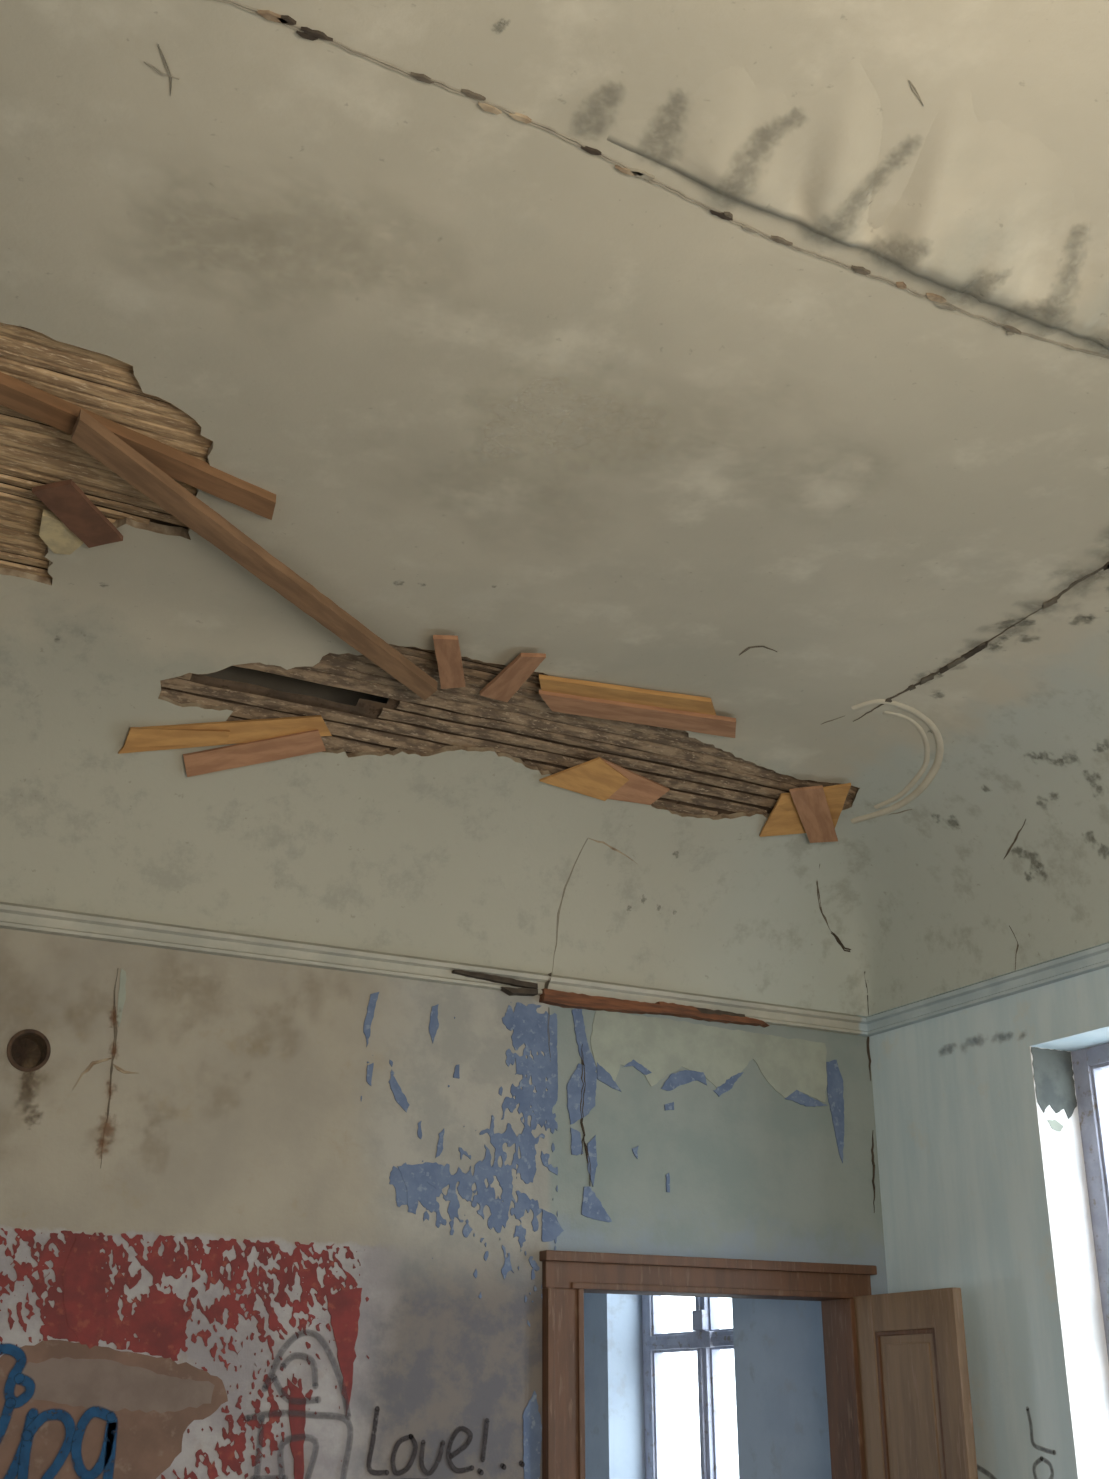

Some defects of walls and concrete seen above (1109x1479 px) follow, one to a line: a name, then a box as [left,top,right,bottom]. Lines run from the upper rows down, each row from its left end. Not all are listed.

crack [215,0,1109,359]
flaking render [0,509,84,585]
spalling [112,517,191,540]
crack [853,562,1109,722]
spalling [323,745,553,775]
spalling [651,804,770,820]
peeling [361,969,844,1327]
peeling [0,1228,369,1479]
peeling [522,1391,542,1479]